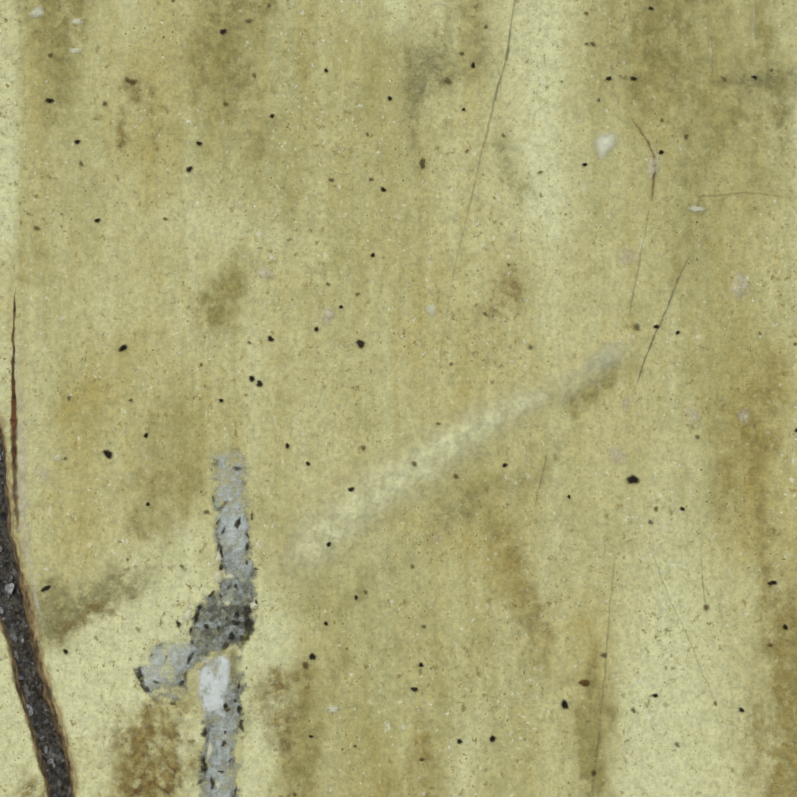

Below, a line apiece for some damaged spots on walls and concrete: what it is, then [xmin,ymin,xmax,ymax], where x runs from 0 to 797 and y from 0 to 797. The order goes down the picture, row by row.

damp [43,0,84,82]
damp [201,271,241,325]
crack [0,295,77,797]
peeling [133,453,258,797]
damp [767,605,797,797]